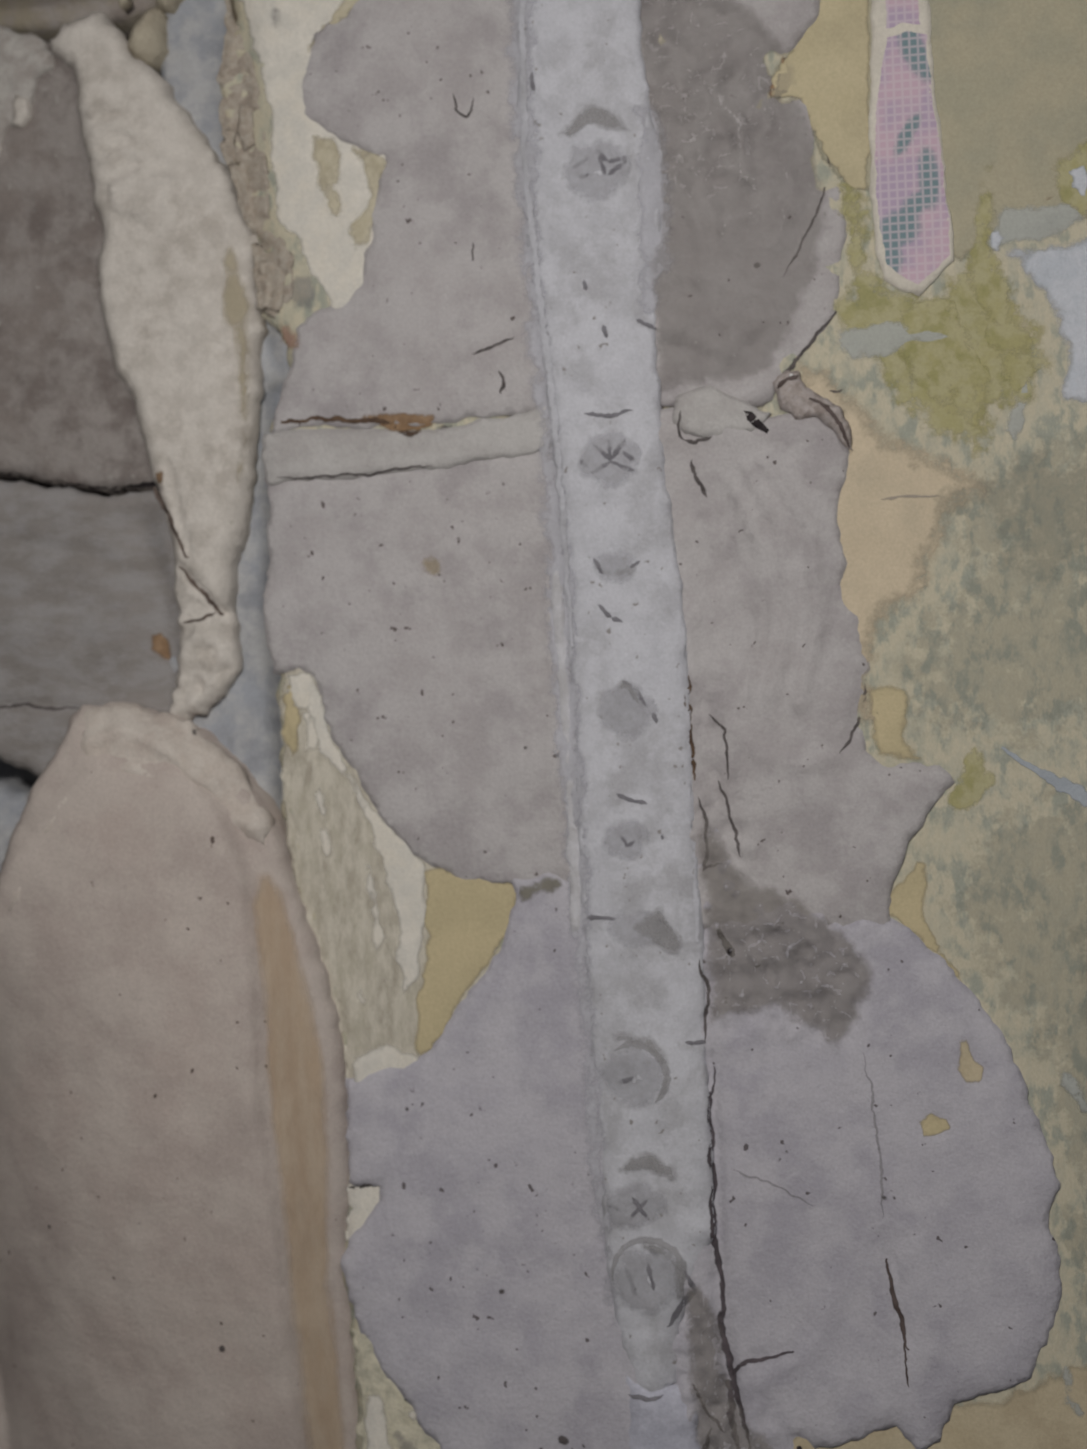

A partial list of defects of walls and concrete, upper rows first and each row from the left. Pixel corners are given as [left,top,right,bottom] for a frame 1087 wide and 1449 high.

peeling [216,0,387,319]
peeling [771,0,872,190]
peeling [928,0,1087,402]
rust [362,413,448,437]
crack [0,473,224,624]
peeling [772,367,986,759]
crack [684,675,742,871]
peeling [280,668,516,1082]
peeling [345,1183,380,1240]
crack [692,929,794,1449]
peeling [351,1321,440,1449]
crack [885,1258,909,1387]